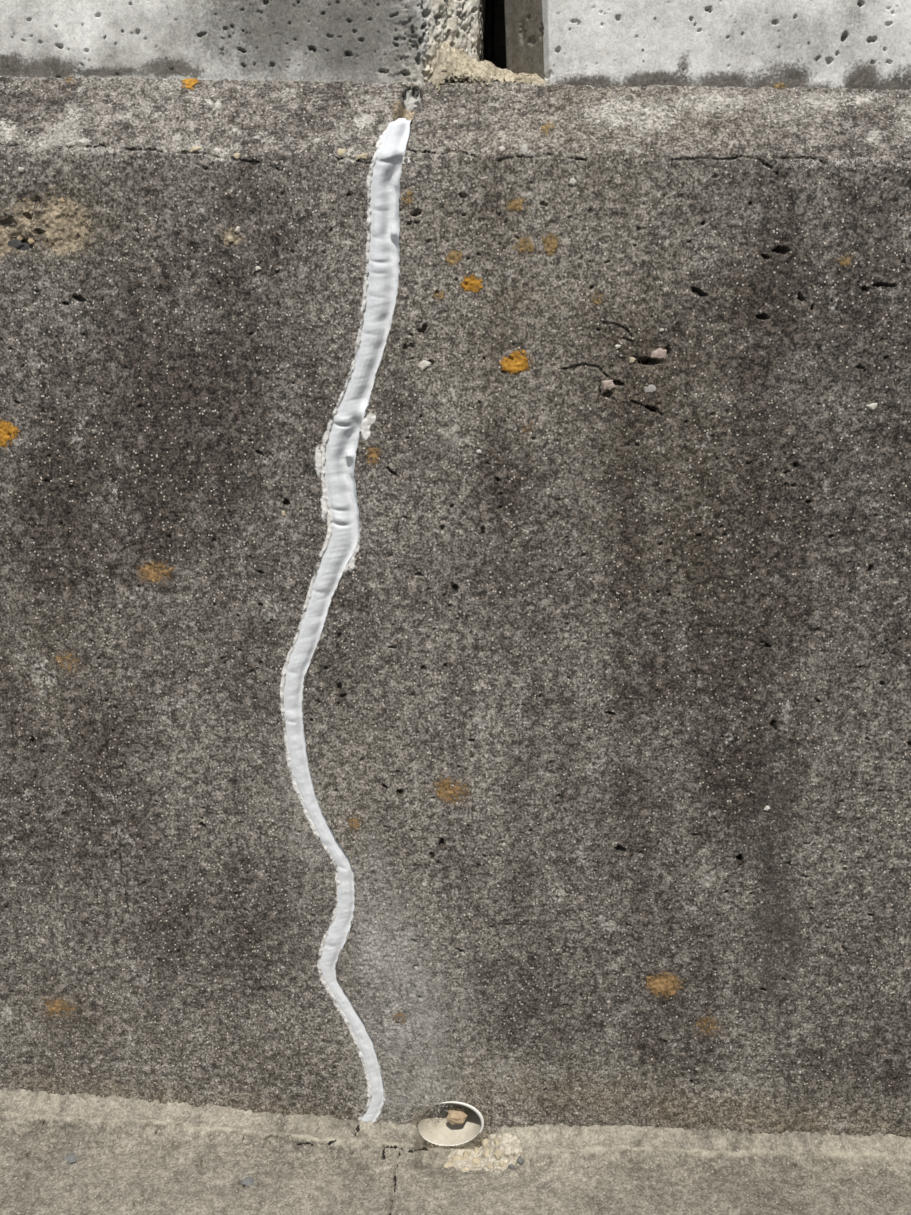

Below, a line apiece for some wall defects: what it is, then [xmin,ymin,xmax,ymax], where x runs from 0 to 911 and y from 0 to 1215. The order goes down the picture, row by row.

crack [59,143,281,171]
crack [674,155,824,167]
crack [280,88,587,1215]